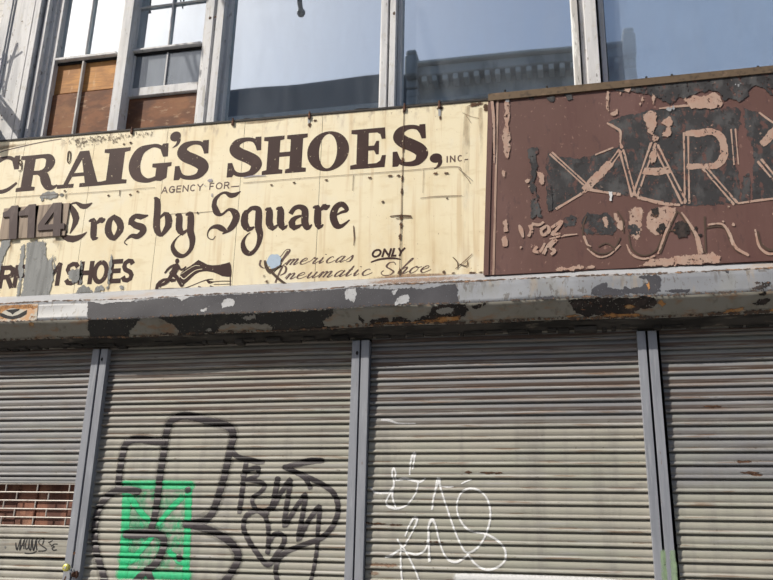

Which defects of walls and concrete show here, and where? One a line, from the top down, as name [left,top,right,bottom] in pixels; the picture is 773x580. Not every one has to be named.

peeling [490,99,511,163]
peeling [605,73,773,163]
peeling [40,191,63,201]
peeling [518,147,702,255]
peeling [0,240,10,270]
peeling [17,240,56,296]
peeling [68,254,486,339]
rust [602,305,640,318]